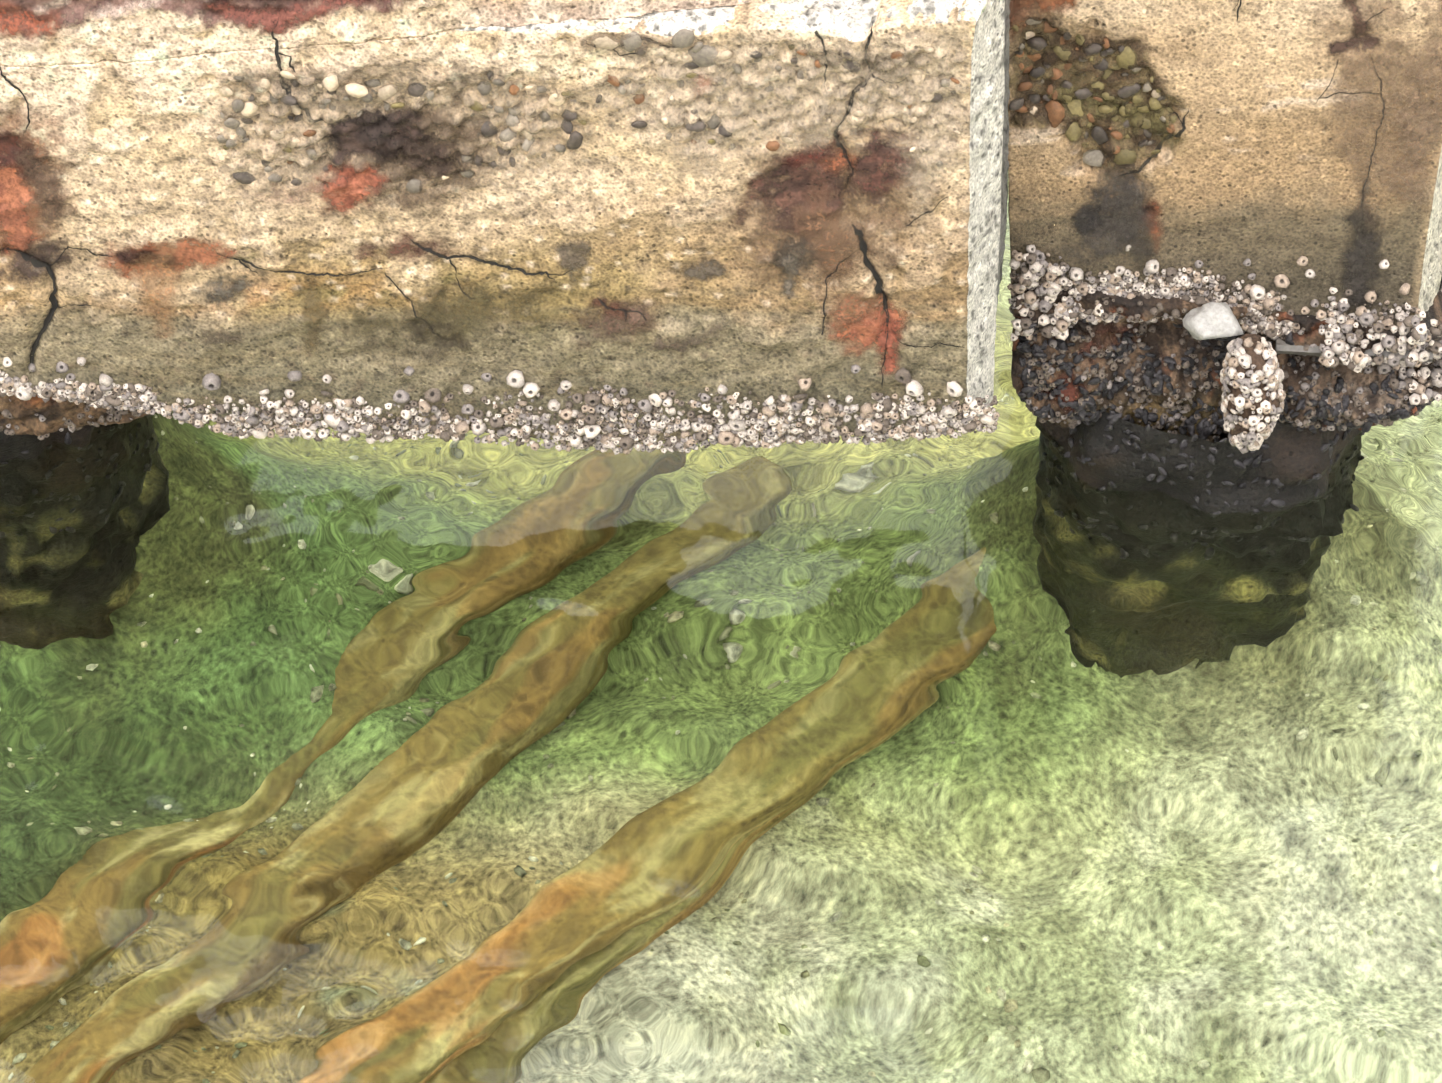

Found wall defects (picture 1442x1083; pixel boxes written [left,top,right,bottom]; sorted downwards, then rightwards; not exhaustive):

rust [0,0,401,40]
rust [1009,0,1074,41]
rust [0,115,71,283]
crack [0,246,114,374]
crack [217,253,447,340]
rust [276,109,484,212]
crack [407,236,575,299]
rust [736,128,916,283]
crack [815,20,906,192]
rust [830,294,906,373]
crack [821,225,965,385]
spalling [1009,17,1184,171]